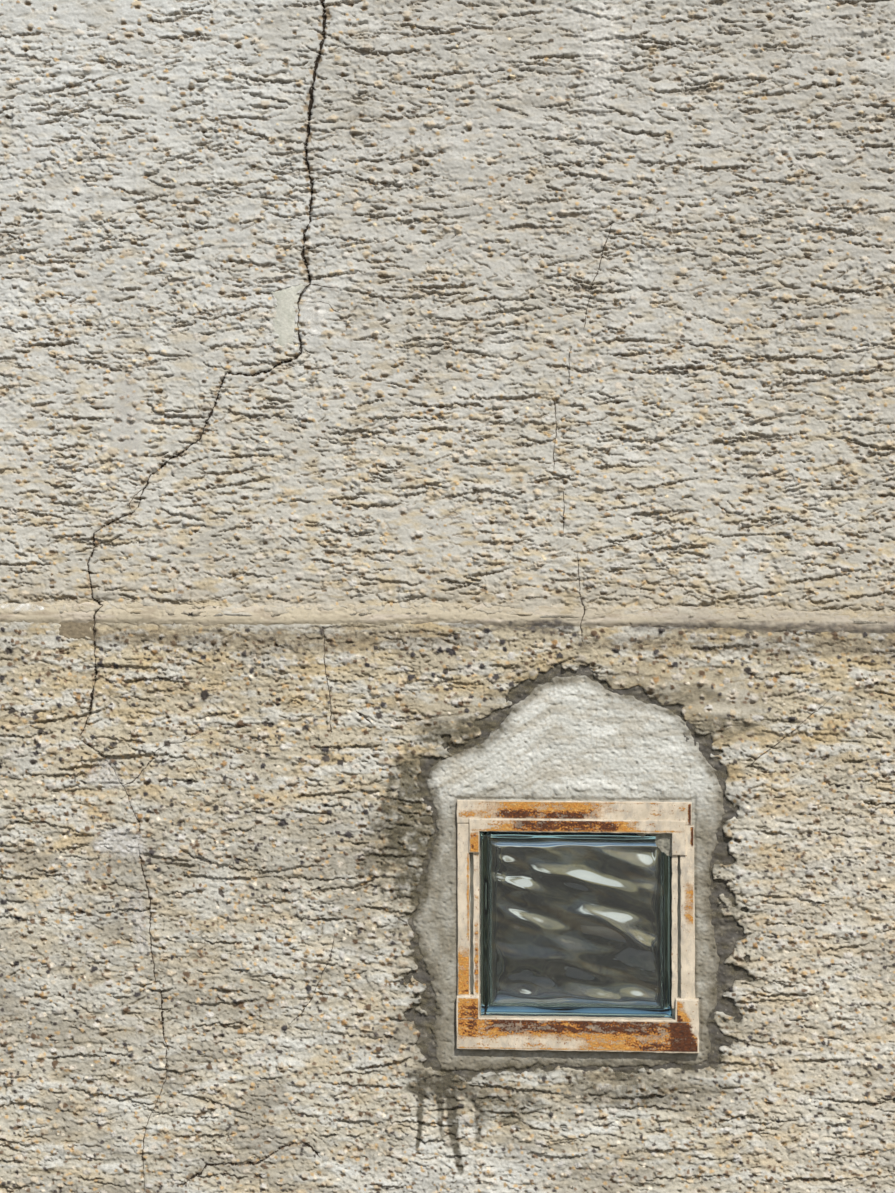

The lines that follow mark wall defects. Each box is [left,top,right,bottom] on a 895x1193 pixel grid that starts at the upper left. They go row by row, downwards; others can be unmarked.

crack [79,0,340,1186]
leakage [360,675,562,918]
rust [458,802,698,1052]
leakage [406,934,554,1173]